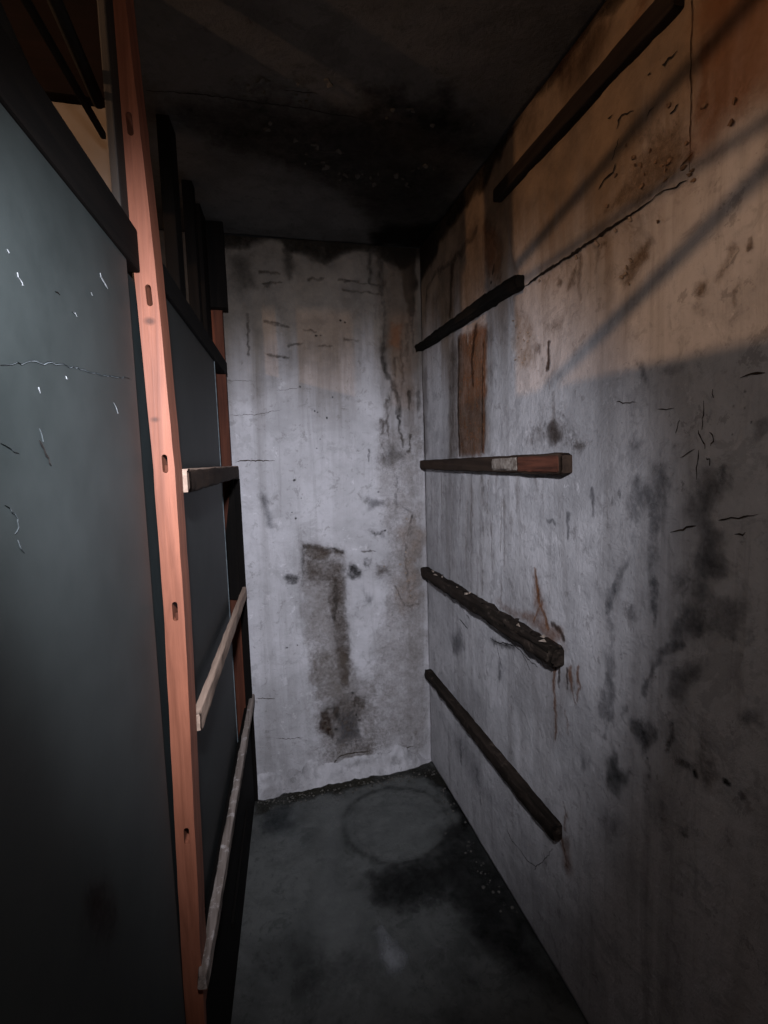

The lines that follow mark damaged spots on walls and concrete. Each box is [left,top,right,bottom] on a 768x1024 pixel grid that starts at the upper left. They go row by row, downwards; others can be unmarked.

crack [525,0,696,286]
corrosion [457,324,487,456]
damp [286,545,365,748]
corrosion [530,569,565,641]
corrosion [553,667,580,737]
damp [373,771,550,982]